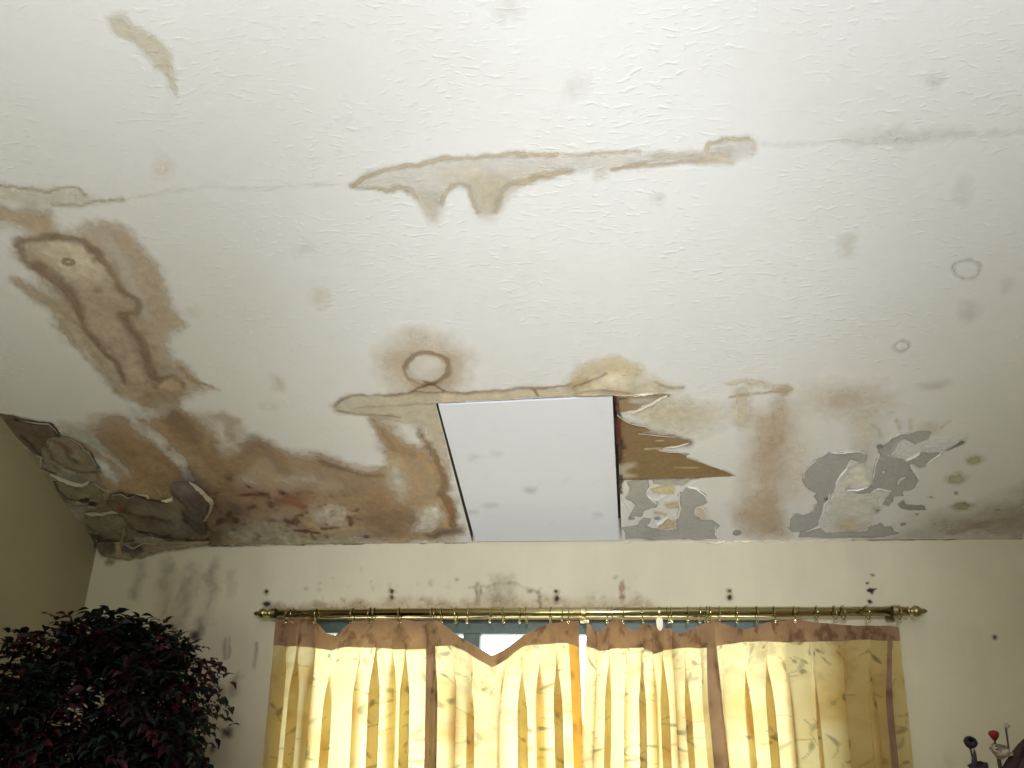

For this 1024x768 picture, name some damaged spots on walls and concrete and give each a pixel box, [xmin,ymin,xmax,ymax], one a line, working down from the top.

water stain [112,17,174,88]
water stain [352,137,754,213]
water stain [0,207,583,545]
flaking render [0,414,209,564]
peeling [622,479,719,540]
water stain [743,421,780,534]
peeling [788,431,964,538]